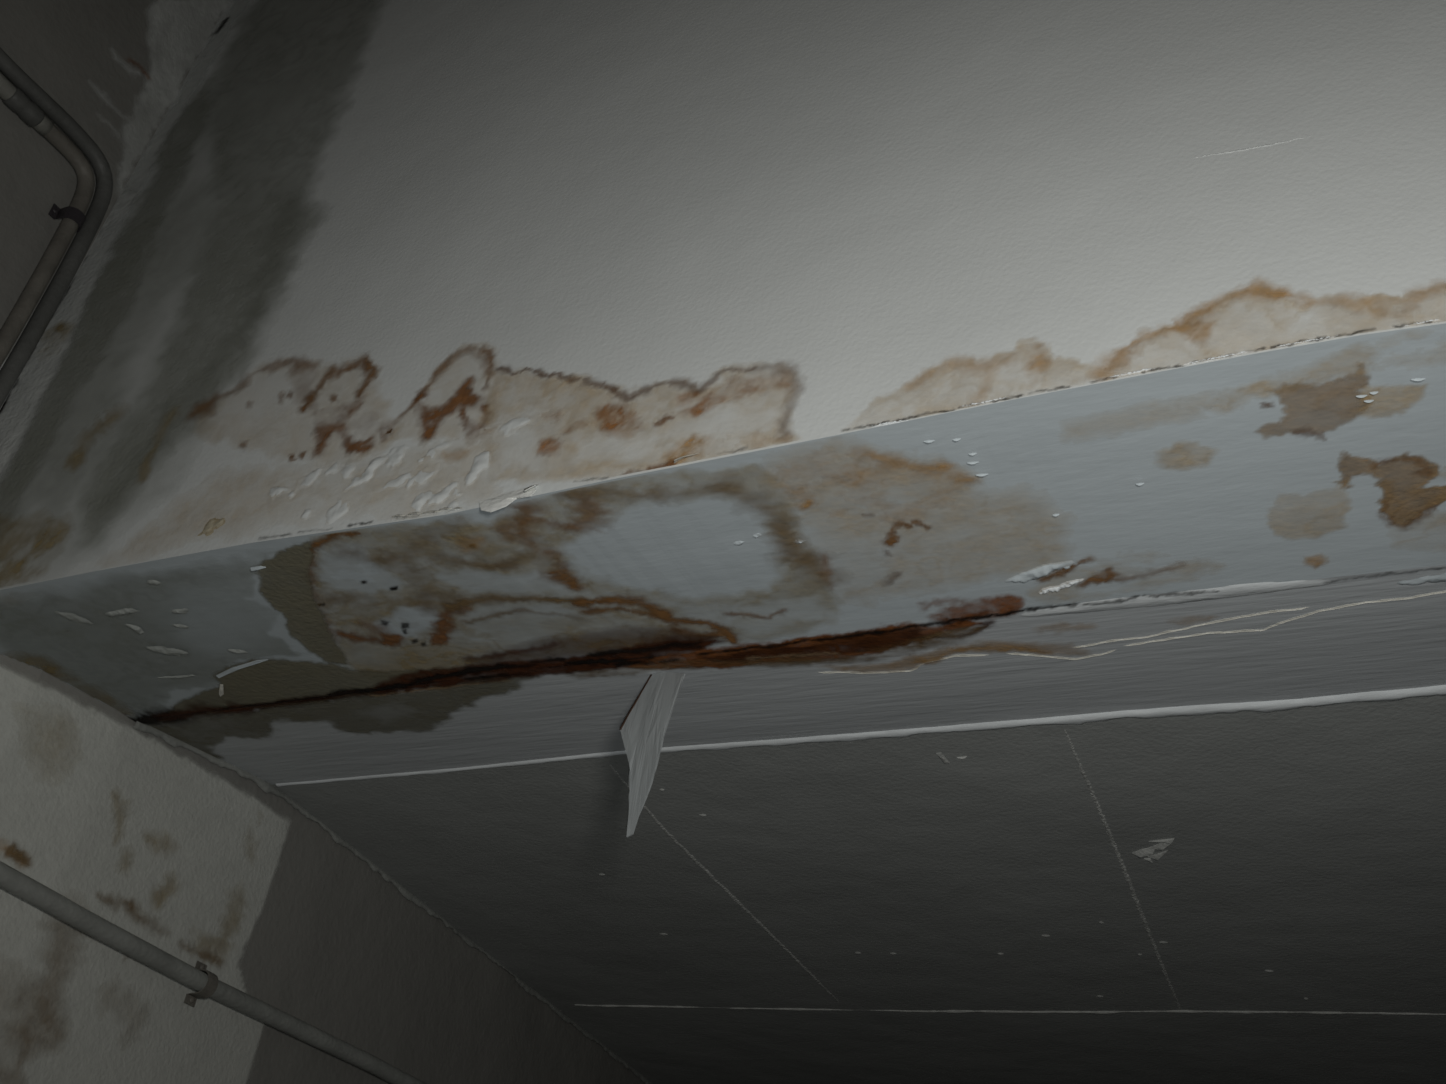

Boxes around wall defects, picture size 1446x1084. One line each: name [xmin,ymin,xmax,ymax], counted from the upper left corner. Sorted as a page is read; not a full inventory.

water stain [0,0,376,587]
water stain [1253,288,1287,298]
water stain [483,350,574,382]
water stain [410,377,488,440]
water stain [592,383,649,430]
water stain [675,382,707,415]
water stain [1265,377,1369,419]
water stain [648,438,694,470]
crack [1397,573,1446,585]
crack [129,593,1176,725]